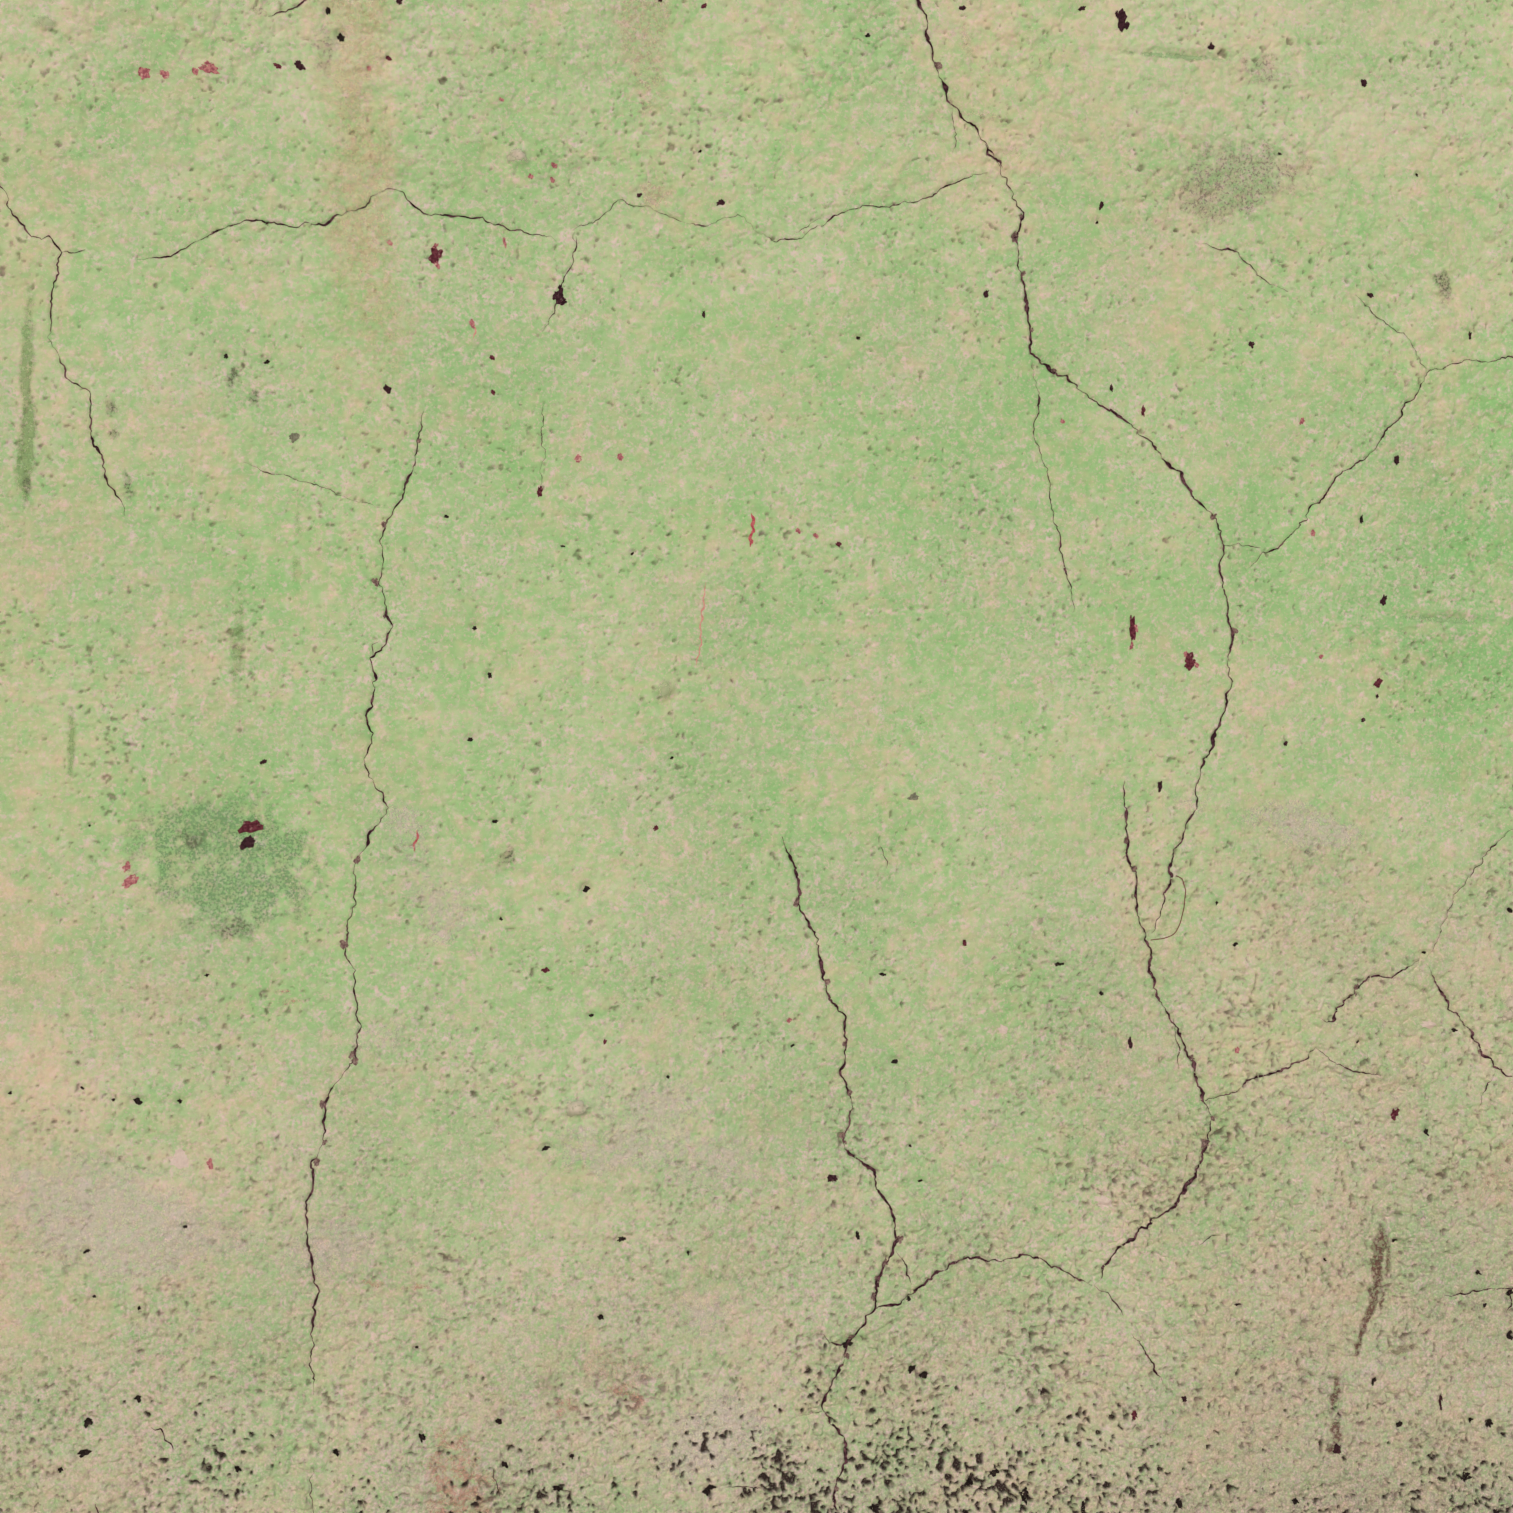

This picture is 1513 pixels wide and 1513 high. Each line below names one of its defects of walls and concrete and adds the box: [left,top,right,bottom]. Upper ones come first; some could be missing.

crack [139,188,553,260]
crack [0,186,125,511]
crack [544,0,1513,1510]
crack [244,411,424,1395]
damp [152,1412,274,1512]
damp [517,1438,594,1513]
damp [627,1368,1183,1513]
damp [1301,1446,1513,1513]